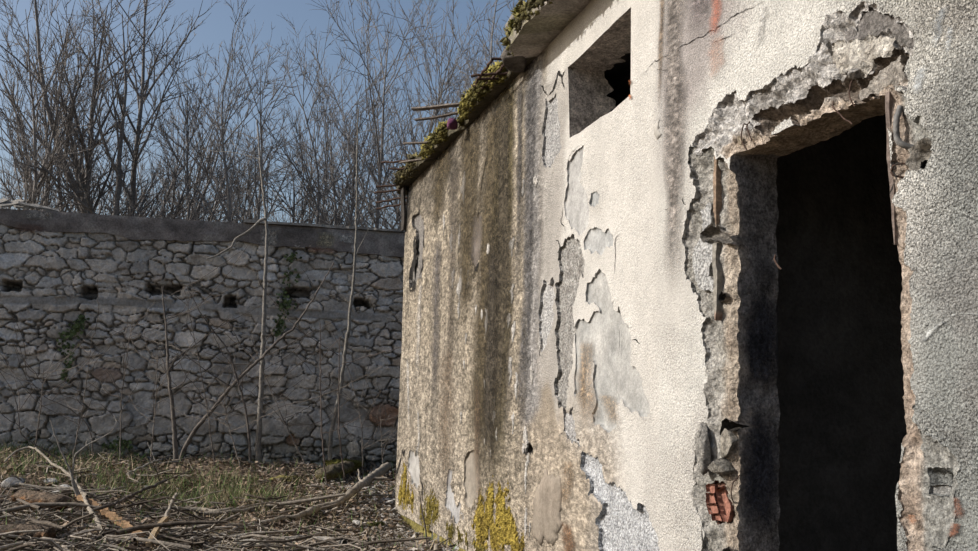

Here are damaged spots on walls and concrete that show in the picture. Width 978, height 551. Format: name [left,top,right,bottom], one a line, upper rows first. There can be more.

peeling [521,94,562,197]
leakage [659,0,683,248]
crack [644,0,765,73]
peeling [451,269,469,320]
leakage [433,81,535,474]
peeling [507,145,661,551]
spalling [681,1,960,551]